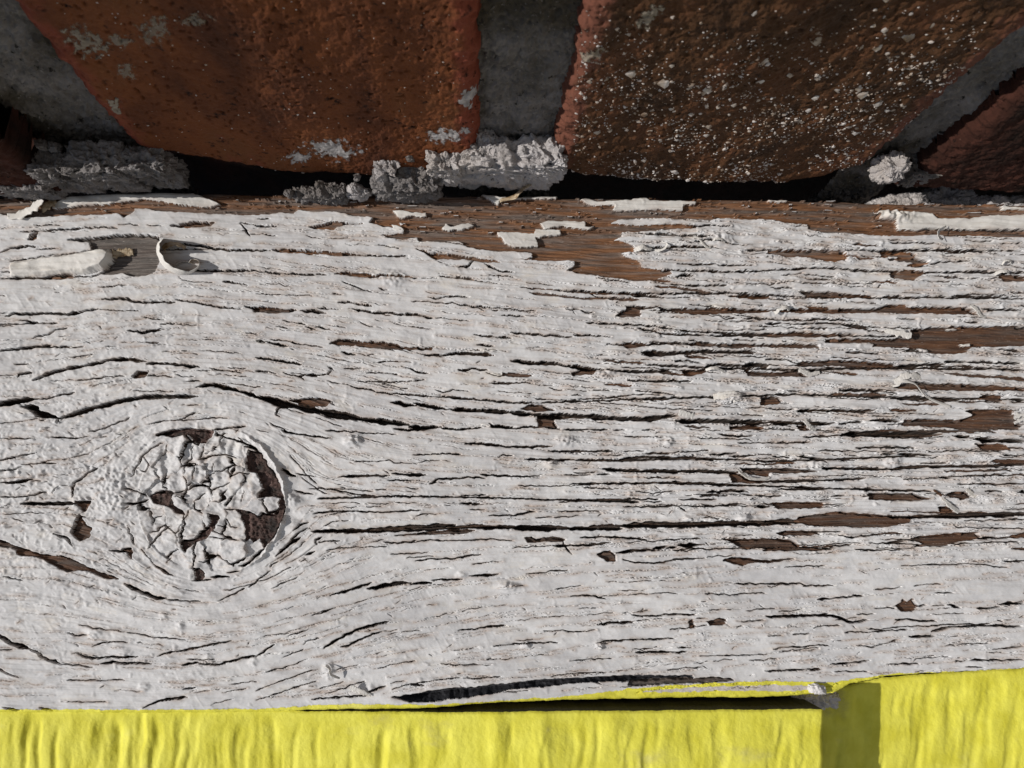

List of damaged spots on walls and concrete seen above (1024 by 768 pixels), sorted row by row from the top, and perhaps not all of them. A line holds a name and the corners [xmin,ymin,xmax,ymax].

peeling [0,193,1024,282]
peeling [616,291,1024,377]
peeling [760,396,781,405]
peeling [893,381,1024,430]
peeling [975,443,1012,452]
crack [0,218,1024,708]
peeling [729,467,815,484]
peeling [868,492,971,512]
peeling [722,502,912,566]
peeling [910,532,980,547]
peeling [597,551,615,562]